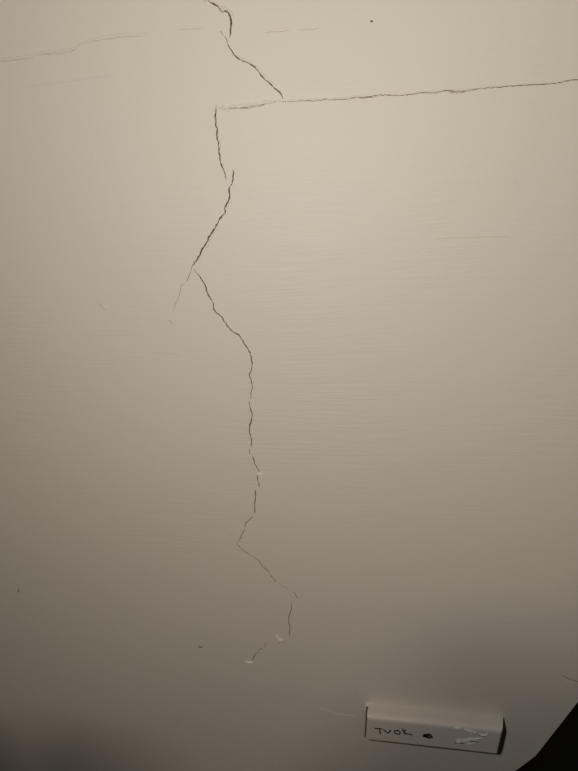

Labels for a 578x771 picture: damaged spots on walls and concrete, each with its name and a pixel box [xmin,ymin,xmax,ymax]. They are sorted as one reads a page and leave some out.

crack [202,0,578,102]
crack [169,110,298,635]